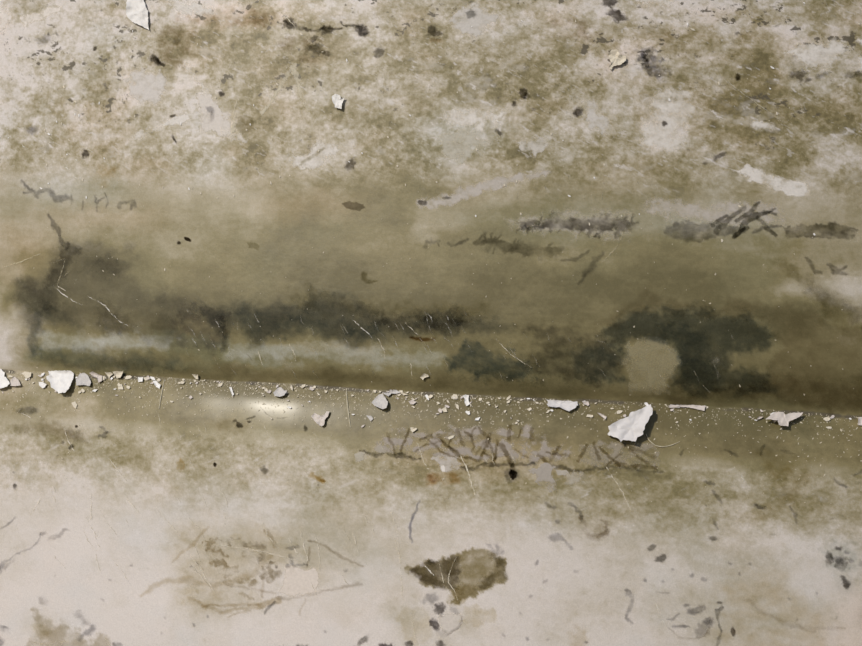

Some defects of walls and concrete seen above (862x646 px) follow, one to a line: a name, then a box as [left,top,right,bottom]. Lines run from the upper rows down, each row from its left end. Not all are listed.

peeling [126,0,149,30]
damp [604,0,624,20]
peeling [0,369,223,408]
peeling [249,383,338,409]
peeling [311,411,330,427]
peeling [749,409,803,430]
peeling [590,402,658,467]